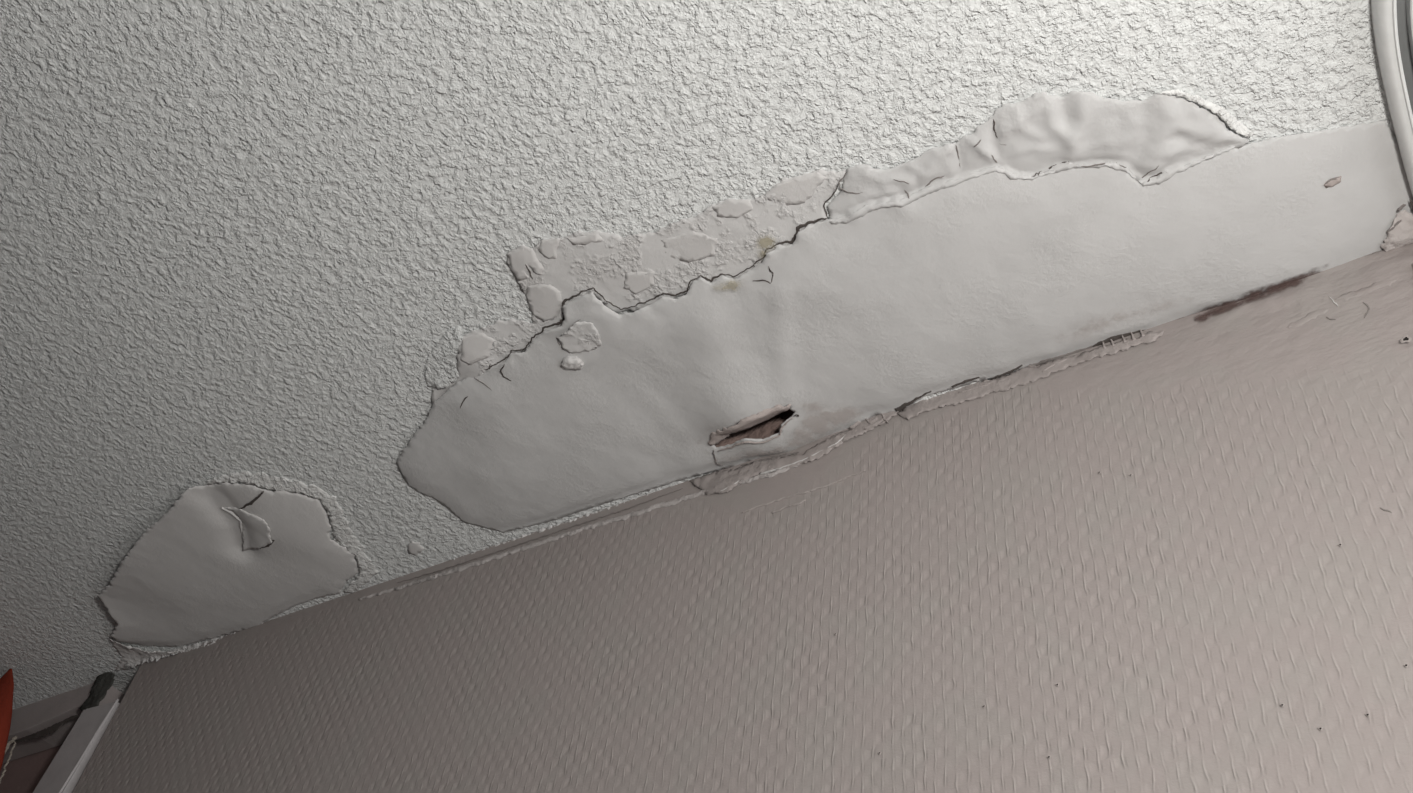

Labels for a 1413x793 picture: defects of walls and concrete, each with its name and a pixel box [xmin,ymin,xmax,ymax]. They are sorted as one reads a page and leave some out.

crack [460,186,838,408]
peeling [423,89,1254,405]
flaking render [1324,176,1341,188]
flaking render [1381,200,1413,252]
spalling [708,404,799,466]
peeling [97,471,378,672]